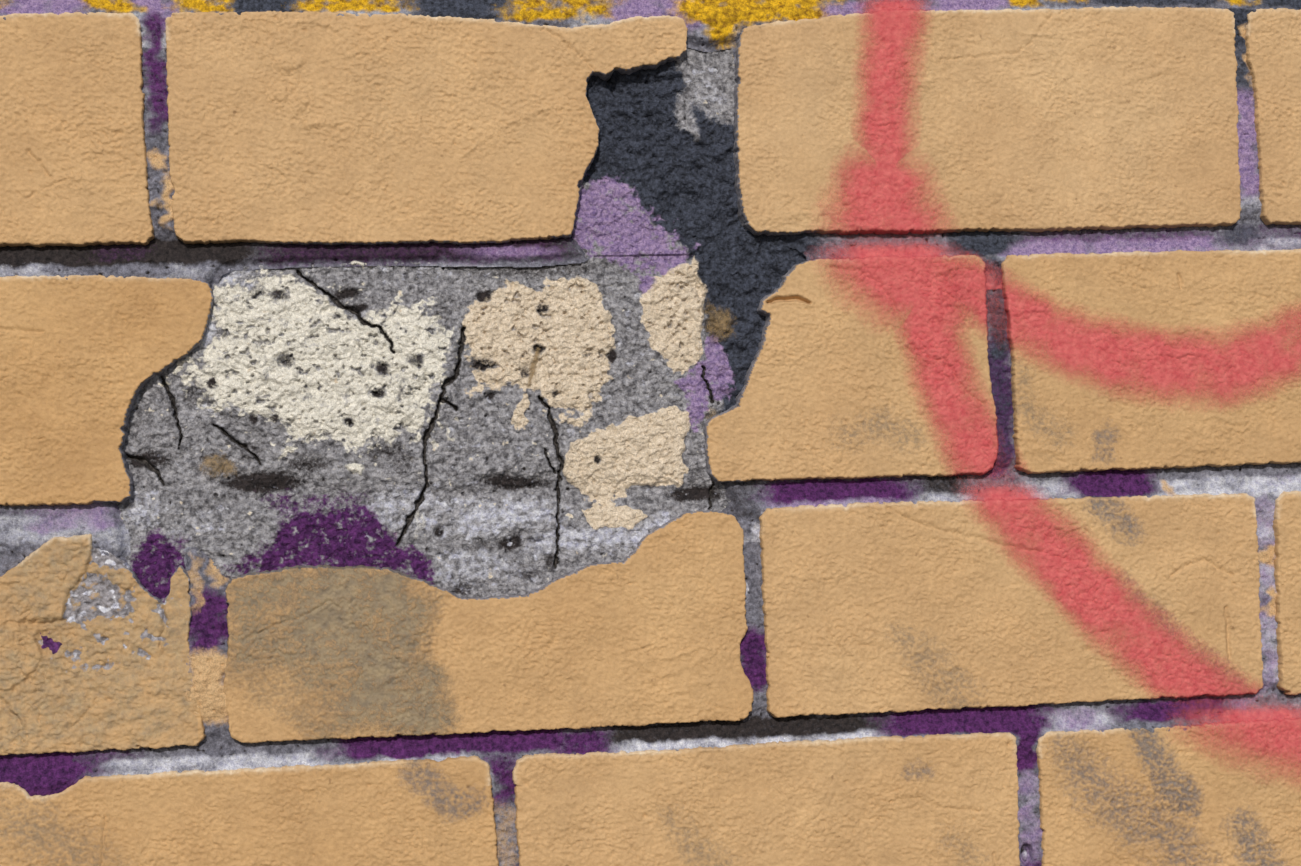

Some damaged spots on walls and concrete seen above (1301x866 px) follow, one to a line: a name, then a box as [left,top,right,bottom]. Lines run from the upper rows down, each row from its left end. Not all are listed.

crack [127,376,183,486]
crack [213,424,261,465]
crack [296,270,395,354]
spalling [35,45,812,661]
crack [396,327,466,546]
crack [538,396,565,569]